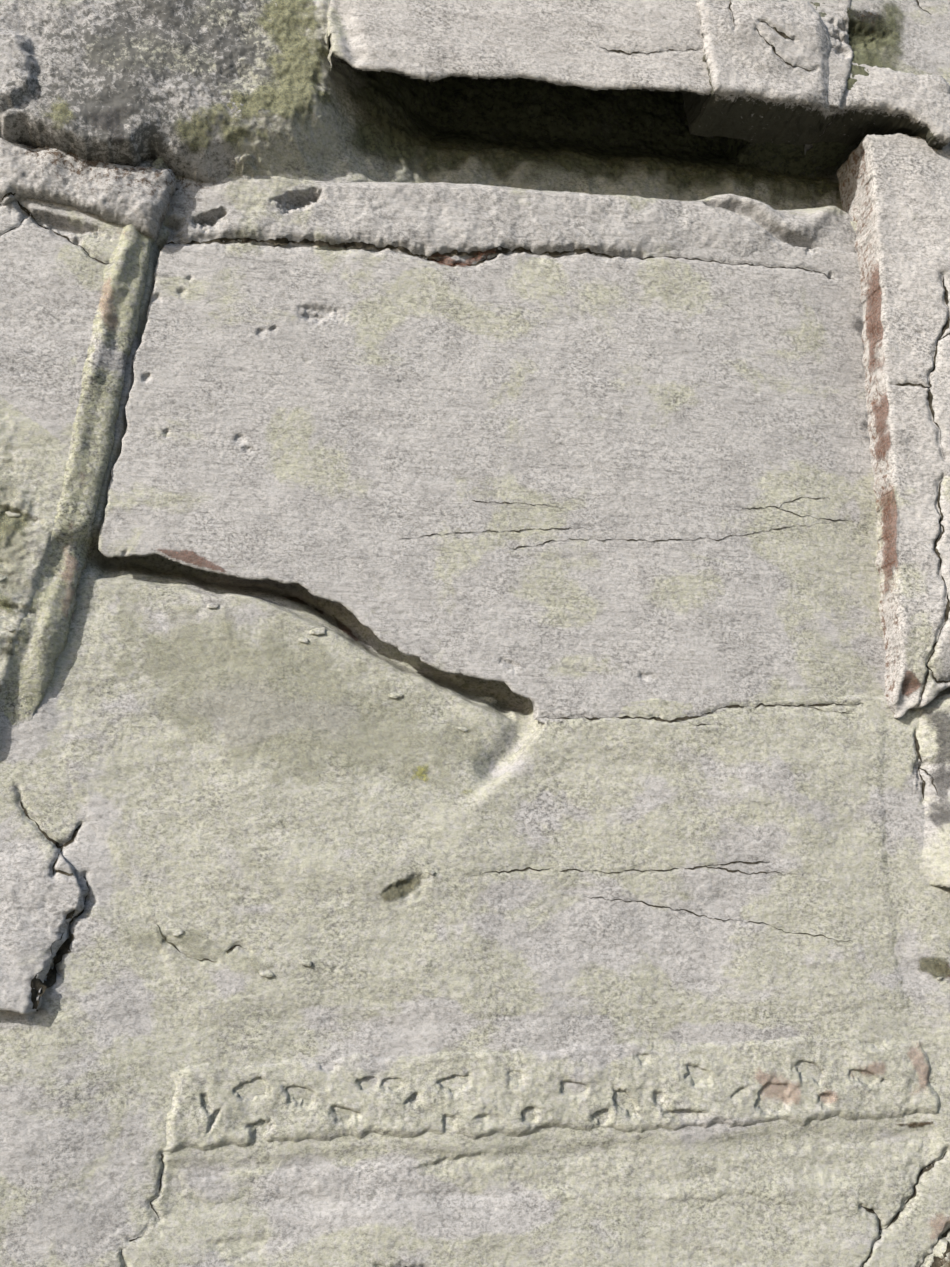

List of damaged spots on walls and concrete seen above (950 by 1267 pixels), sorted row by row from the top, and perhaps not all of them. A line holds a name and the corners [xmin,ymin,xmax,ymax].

crack [160,237,830,279]
crack [401,497,848,550]
crack [891,277,950,802]
crack [545,703,864,727]
peeling [0,837,85,1015]
crack [465,861,851,941]
crack [861,1151,950,1267]